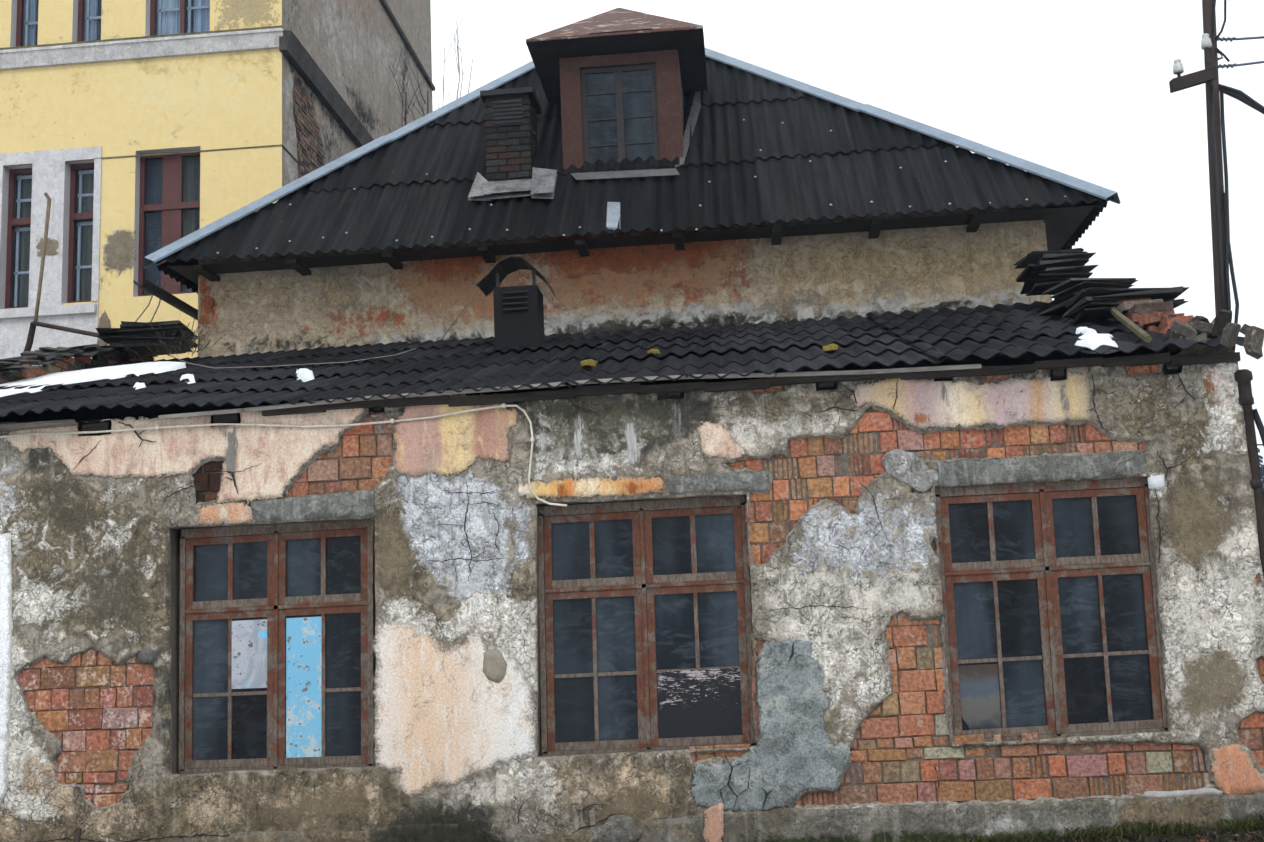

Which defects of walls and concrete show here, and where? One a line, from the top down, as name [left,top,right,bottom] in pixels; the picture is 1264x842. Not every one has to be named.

peeling [215,0,279,30]
peeling [0,393,518,525]
spalling [697,366,1149,567]
spalling [13,646,158,811]
spalling [689,633,768,764]
spalling [792,610,1264,809]